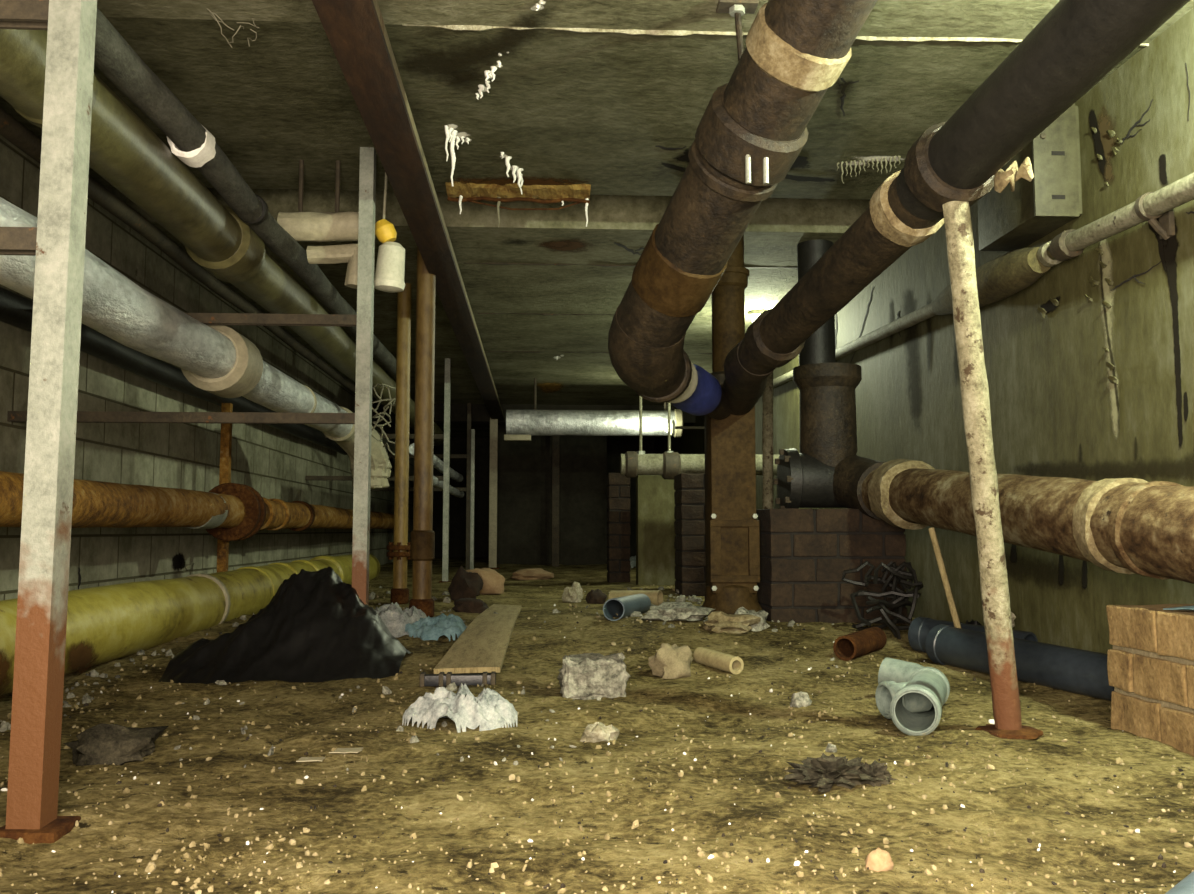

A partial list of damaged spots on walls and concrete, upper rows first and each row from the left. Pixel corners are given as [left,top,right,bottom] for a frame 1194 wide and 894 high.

damp [406,0,545,100]
crack [1121,99,1153,144]
damp [445,124,471,187]
damp [500,152,524,195]
damp [837,156,903,183]
damp [1159,154,1168,185]
damp [1017,209,1194,478]
rust [0,650,13,695]